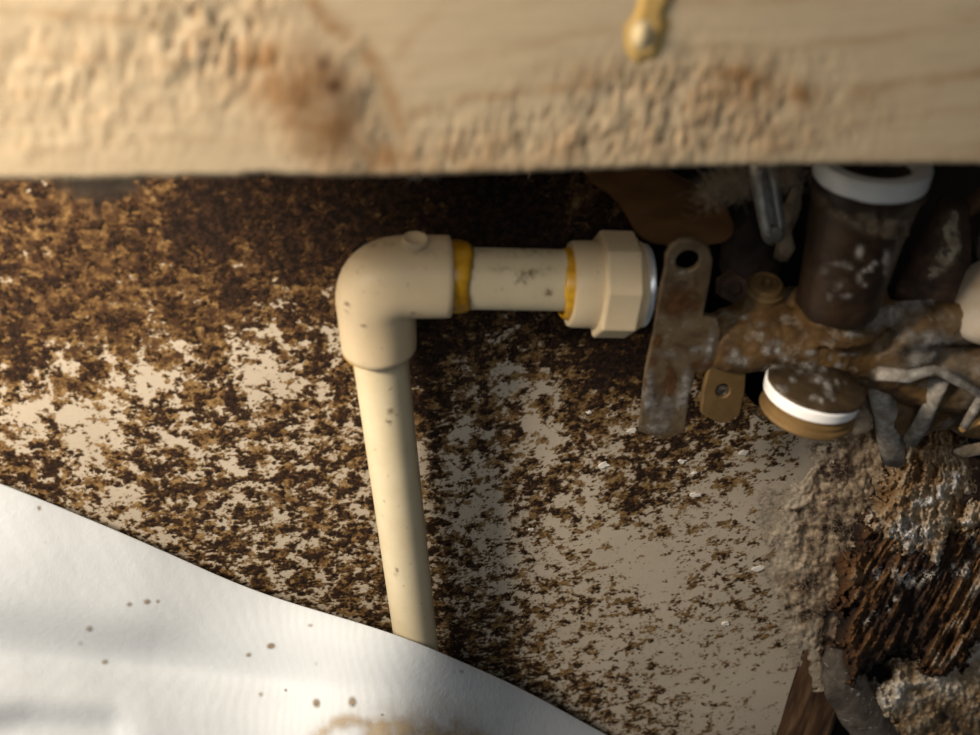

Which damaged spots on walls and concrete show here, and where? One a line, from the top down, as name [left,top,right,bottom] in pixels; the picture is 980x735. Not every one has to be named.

damp [858,253,890,281]
damp [775,351,844,403]
damp [408,310,802,735]
damp [873,567,939,587]
damp [951,563,971,577]
damp [321,718,414,735]